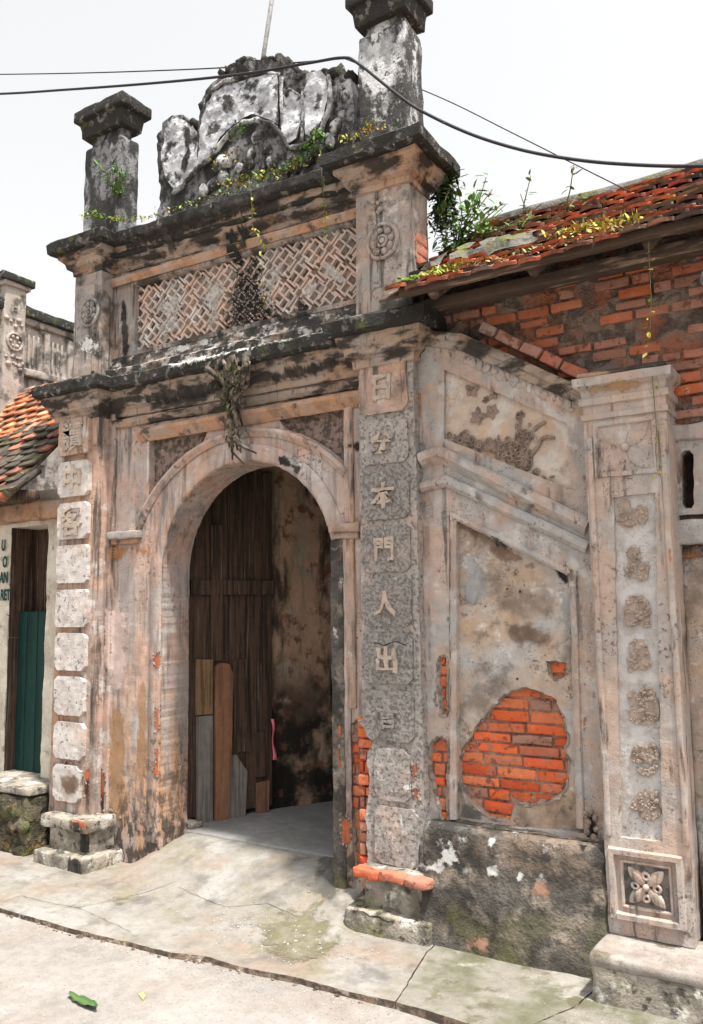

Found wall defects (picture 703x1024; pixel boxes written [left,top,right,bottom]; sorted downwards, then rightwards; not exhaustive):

leakage [119,171,346,369]
mould [145,378,225,404]
mould [271,359,339,383]
flaking render [436,654,450,718]
flaking render [547,660,566,682]
flaking render [410,678,571,822]
flaking render [337,718,434,891]